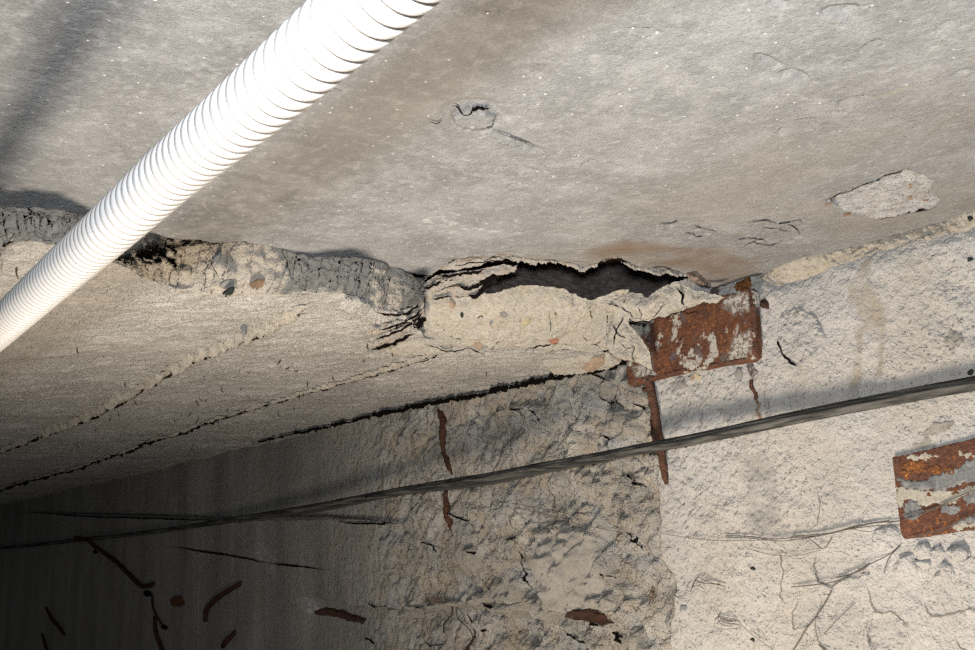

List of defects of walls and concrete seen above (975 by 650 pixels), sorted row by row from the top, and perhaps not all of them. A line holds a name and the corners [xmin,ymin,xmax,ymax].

spalling [431,104,536,152]
spalling [825,169,939,220]
spalling [0,206,84,271]
spalling [113,233,630,356]
peeling [621,261,711,288]
crack [253,288,697,444]
crack [0,336,453,492]
corrosion [898,460,955,498]
crack [340,519,398,527]
crack [166,546,325,570]
corrosion [314,607,366,624]
corrosion [565,608,614,626]